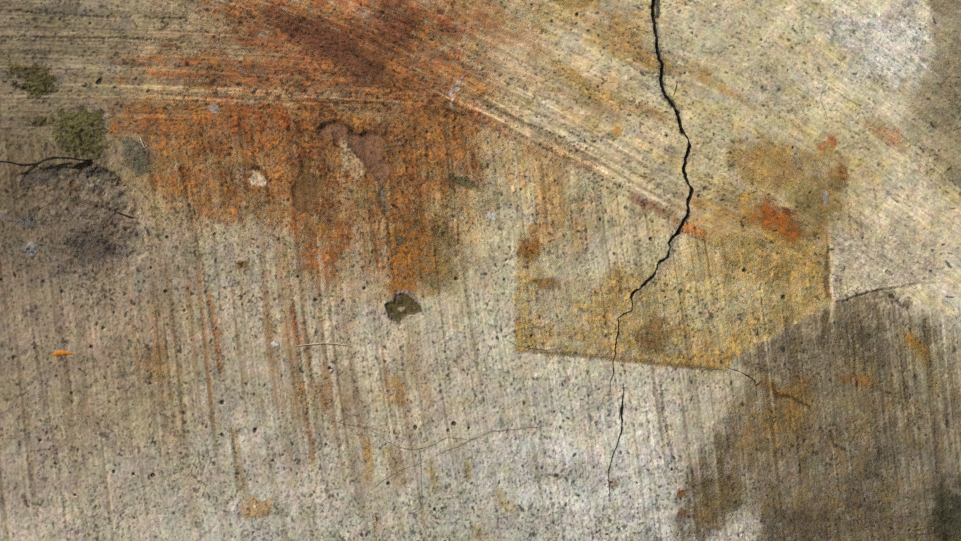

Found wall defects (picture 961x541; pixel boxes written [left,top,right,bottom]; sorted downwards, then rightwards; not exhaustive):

corrosion [187,266,222,409]
corrosion [262,270,314,459]
corrosion [109,0,513,295]
spalling [385,290,422,323]
water stain [506,145,583,252]
corrosion [529,173,564,254]
crack [608,0,693,502]
water stain [514,192,961,541]
corrosion [729,136,848,245]